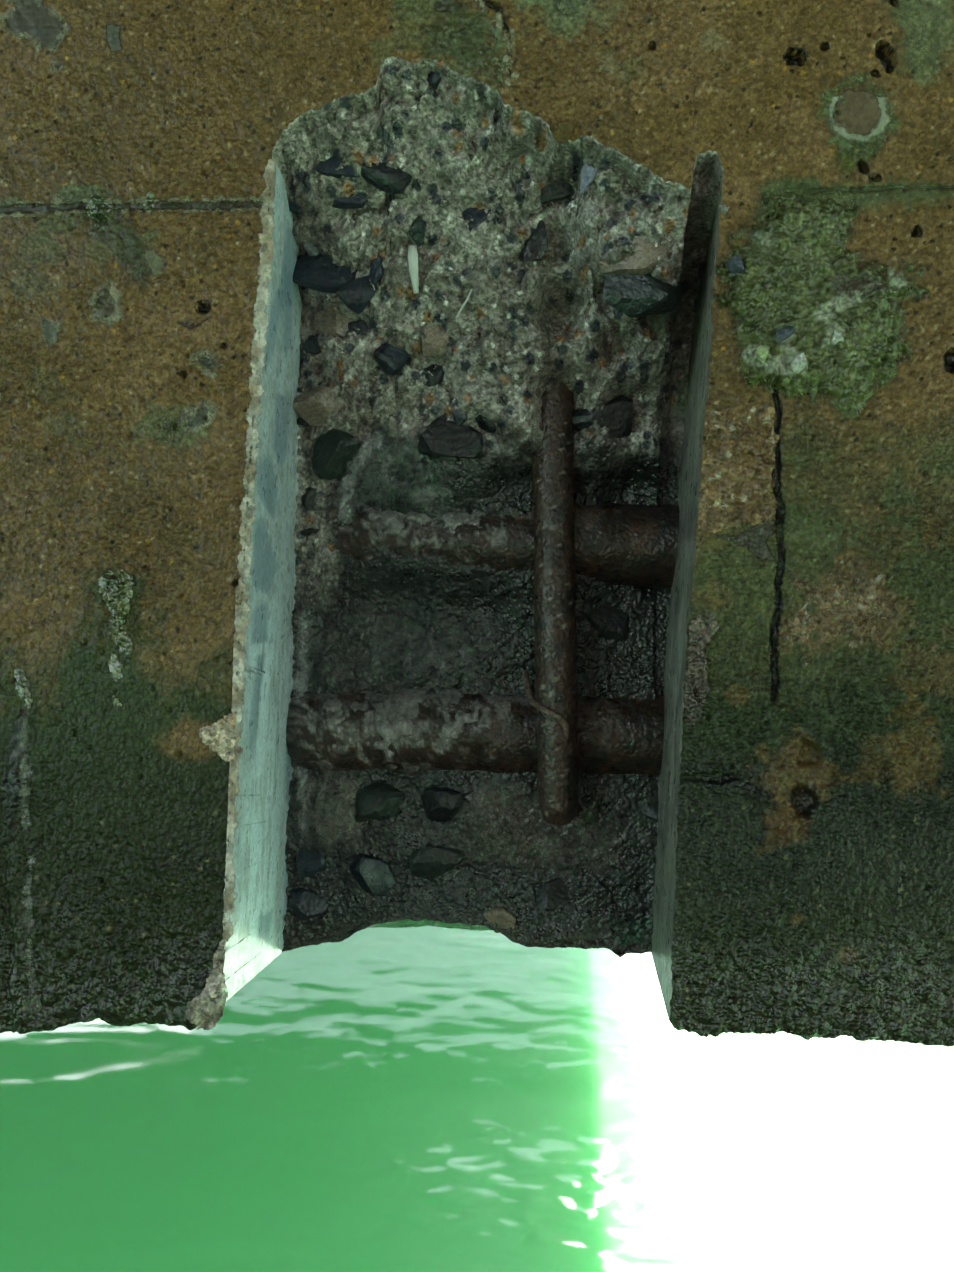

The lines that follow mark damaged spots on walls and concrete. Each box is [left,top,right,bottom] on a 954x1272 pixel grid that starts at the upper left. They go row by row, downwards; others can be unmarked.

spalling [185,56,724,1030]
crack [769,390,786,702]
water stain [4,668,33,830]
water stain [22,856,41,1018]